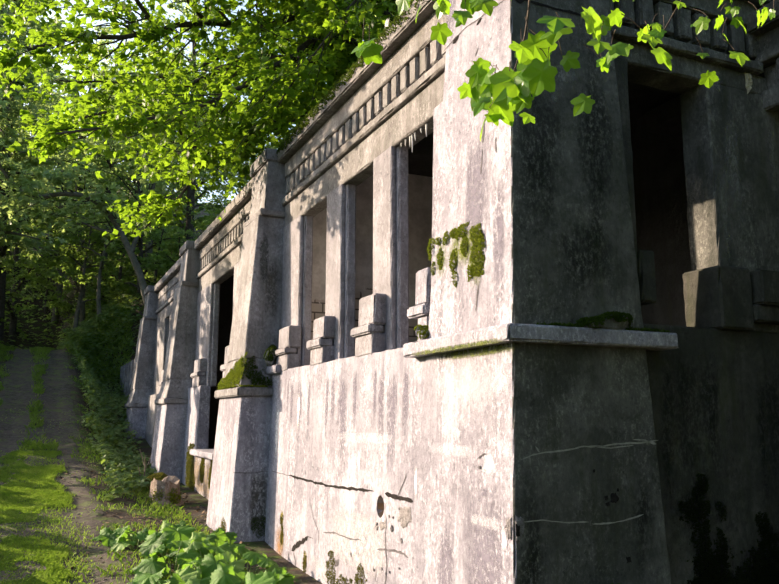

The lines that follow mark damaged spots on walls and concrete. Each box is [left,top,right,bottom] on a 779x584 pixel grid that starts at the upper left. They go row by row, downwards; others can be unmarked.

water stain [275,383,310,450]
water stain [325,380,356,440]
water stain [373,374,408,451]
crack [521,439,658,460]
crack [234,471,413,503]
crack [288,503,408,583]
flaking render [315,506,412,581]
water stain [439,535,452,584]
water stain [469,507,506,584]
crack [525,514,644,525]